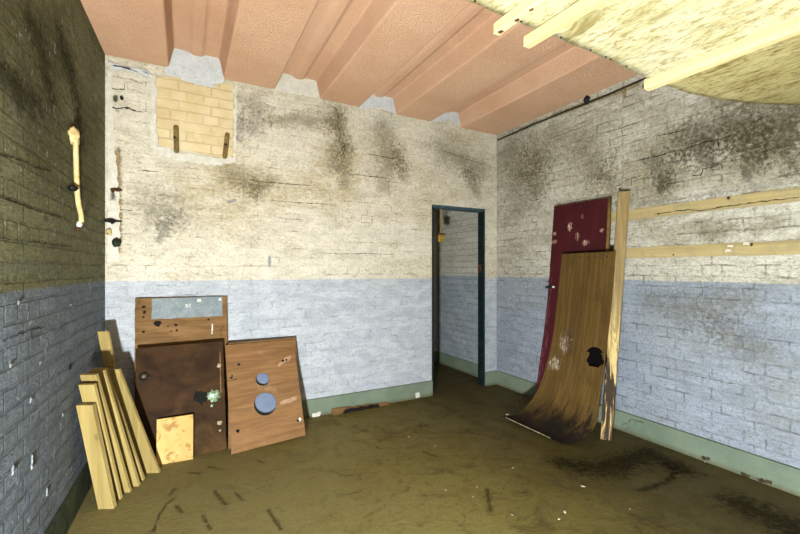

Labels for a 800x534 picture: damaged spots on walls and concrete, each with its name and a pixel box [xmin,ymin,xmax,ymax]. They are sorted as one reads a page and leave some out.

water stain [25,14,84,197]
peeling [148,73,238,166]
crack [614,129,730,187]
water stain [547,448,698,491]